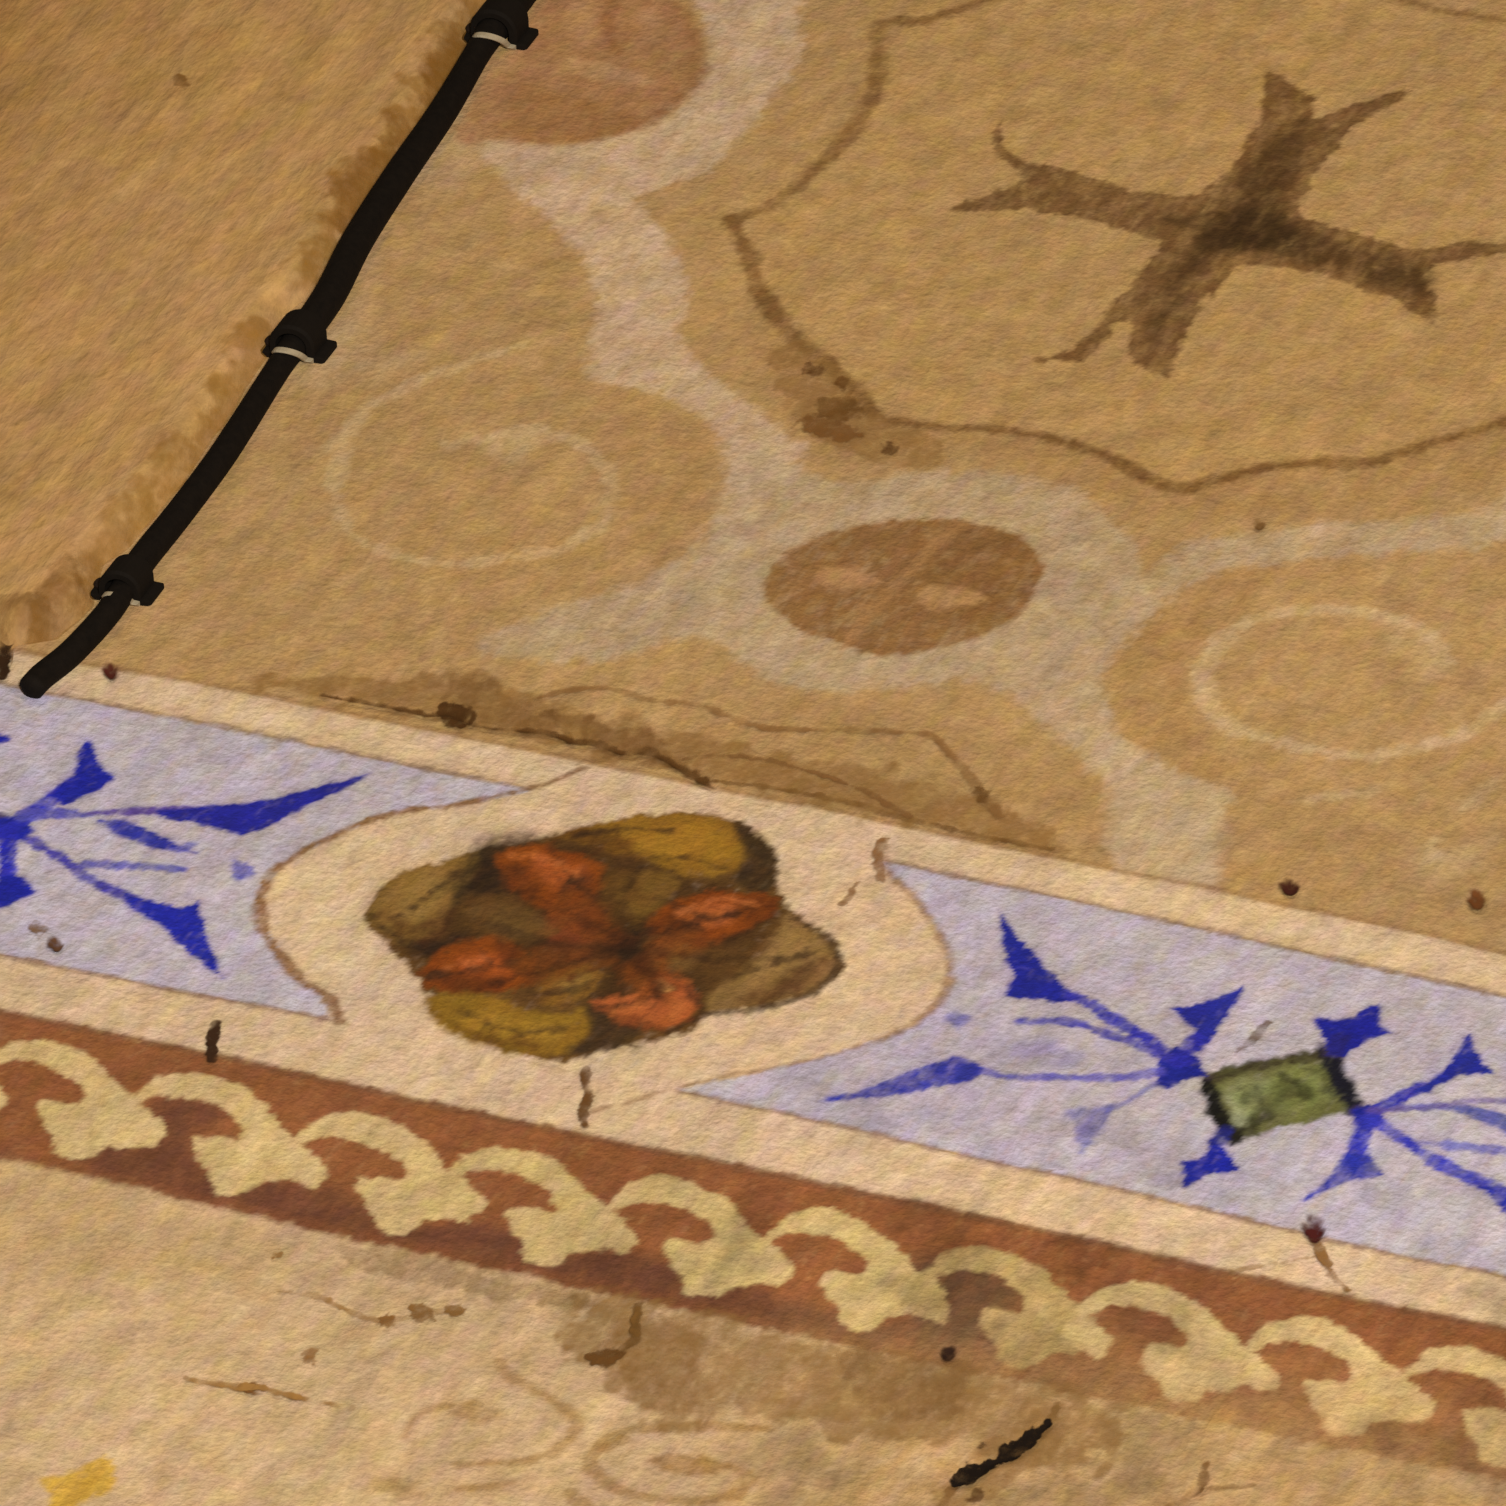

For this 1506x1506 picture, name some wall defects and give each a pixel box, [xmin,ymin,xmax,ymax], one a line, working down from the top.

crack [945,1404,1059,1501]